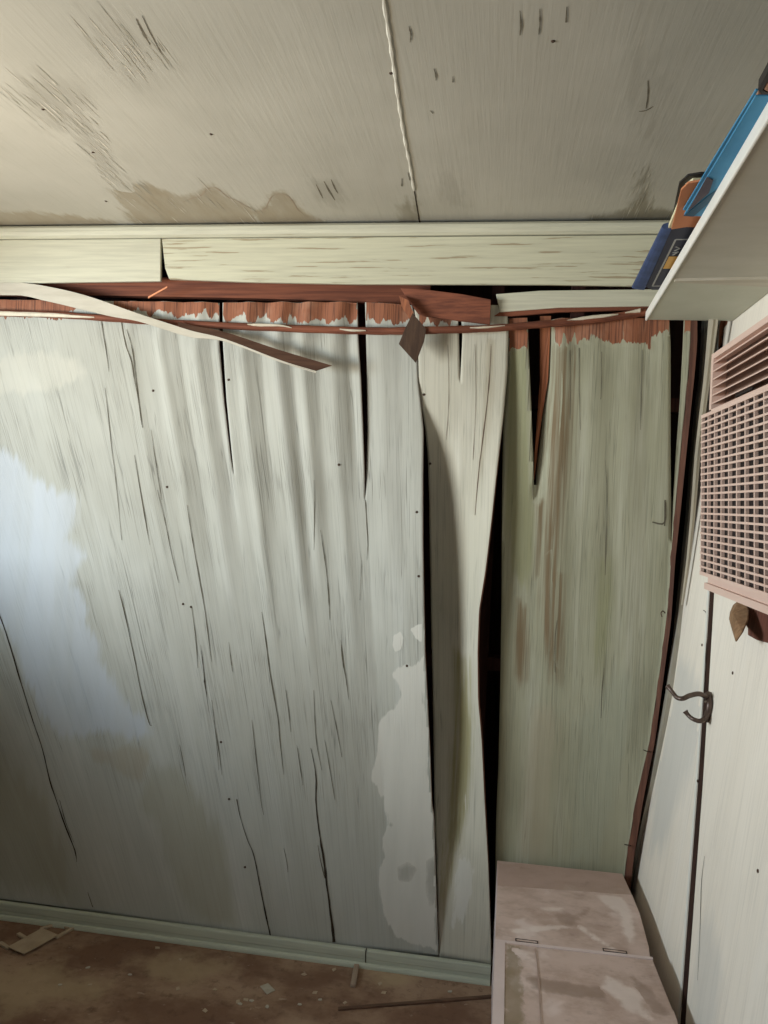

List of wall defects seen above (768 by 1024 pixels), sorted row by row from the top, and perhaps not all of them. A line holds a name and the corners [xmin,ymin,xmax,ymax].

damp [0,178,338,226]
crack [401,173,421,223]
peeling [0,300,94,324]
peeling [110,301,458,332]
peeling [550,309,670,353]
crack [101,321,233,774]
crack [314,495,330,617]
damp [470,335,645,872]
crack [0,616,77,862]
crack [236,616,349,942]